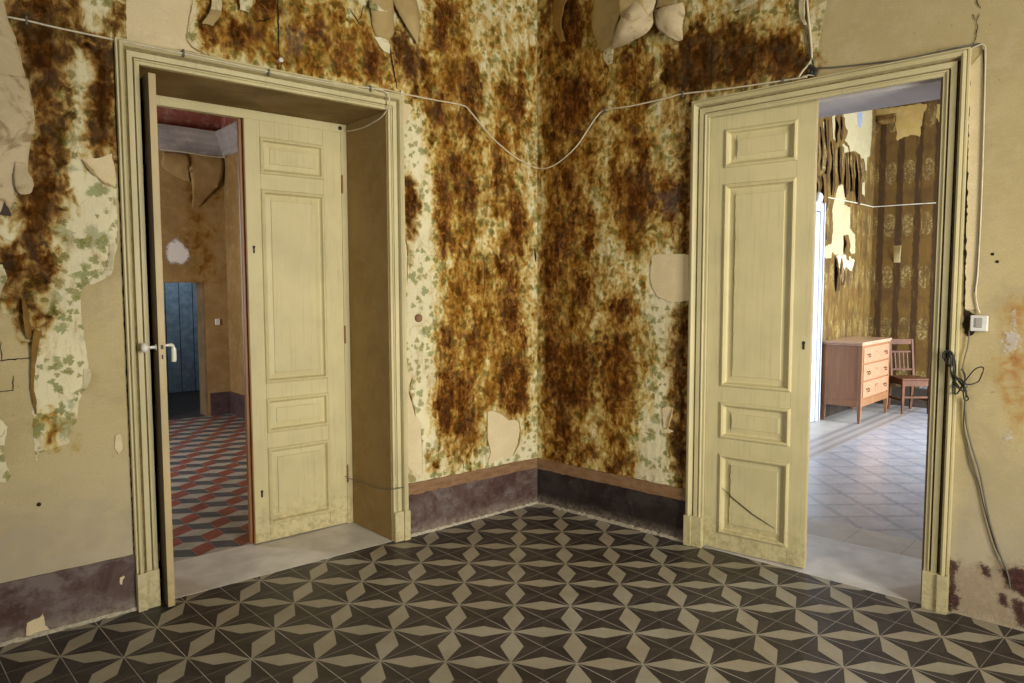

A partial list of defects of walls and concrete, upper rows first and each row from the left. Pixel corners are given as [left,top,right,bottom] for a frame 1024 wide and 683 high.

water stain [0,0,126,346]
peeling [81,154,116,187]
water stain [198,0,819,489]
peeling [824,182,855,271]
peeling [650,254,689,303]
peeling [487,411,521,464]
peeling [948,560,961,612]
peeling [980,565,1024,628]